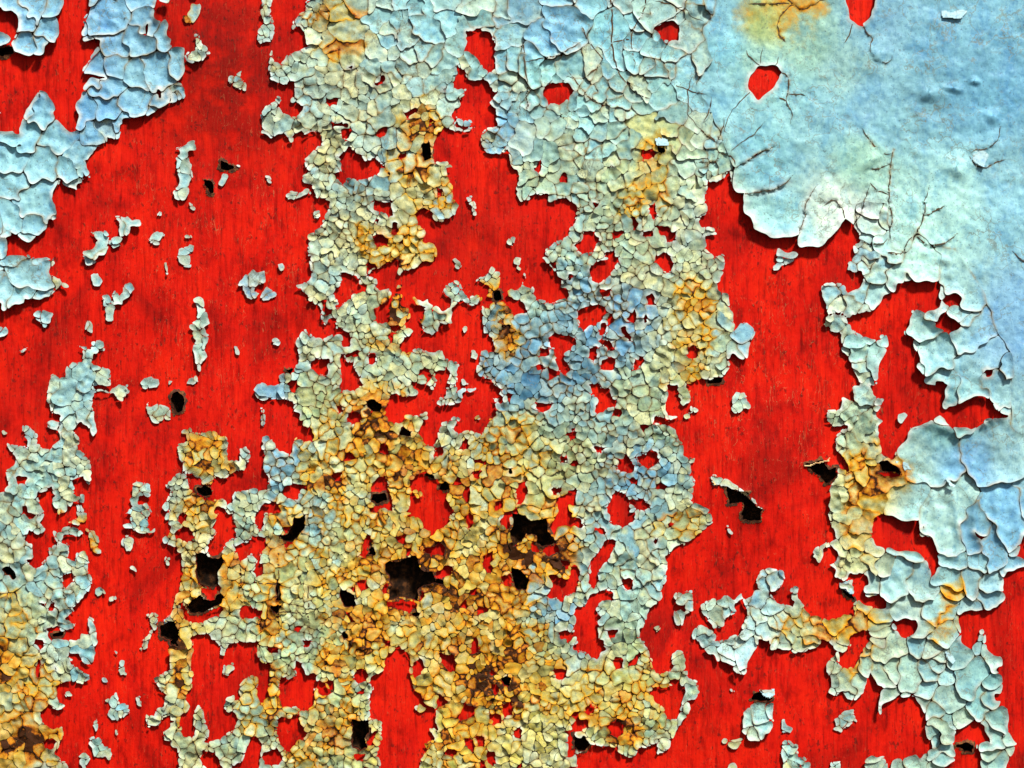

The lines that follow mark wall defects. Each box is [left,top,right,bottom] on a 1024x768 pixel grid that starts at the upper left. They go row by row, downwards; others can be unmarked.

peeling [0,0,210,328]
rust [352,94,457,269]
crack [676,78,774,169]
crack [747,0,821,124]
crack [797,130,957,255]
crack [970,128,1003,168]
peeling [0,321,130,768]
rust [166,489,219,728]
rust [216,379,669,768]
peeling [692,568,826,675]
rust [840,439,914,555]
peeling [722,690,811,768]